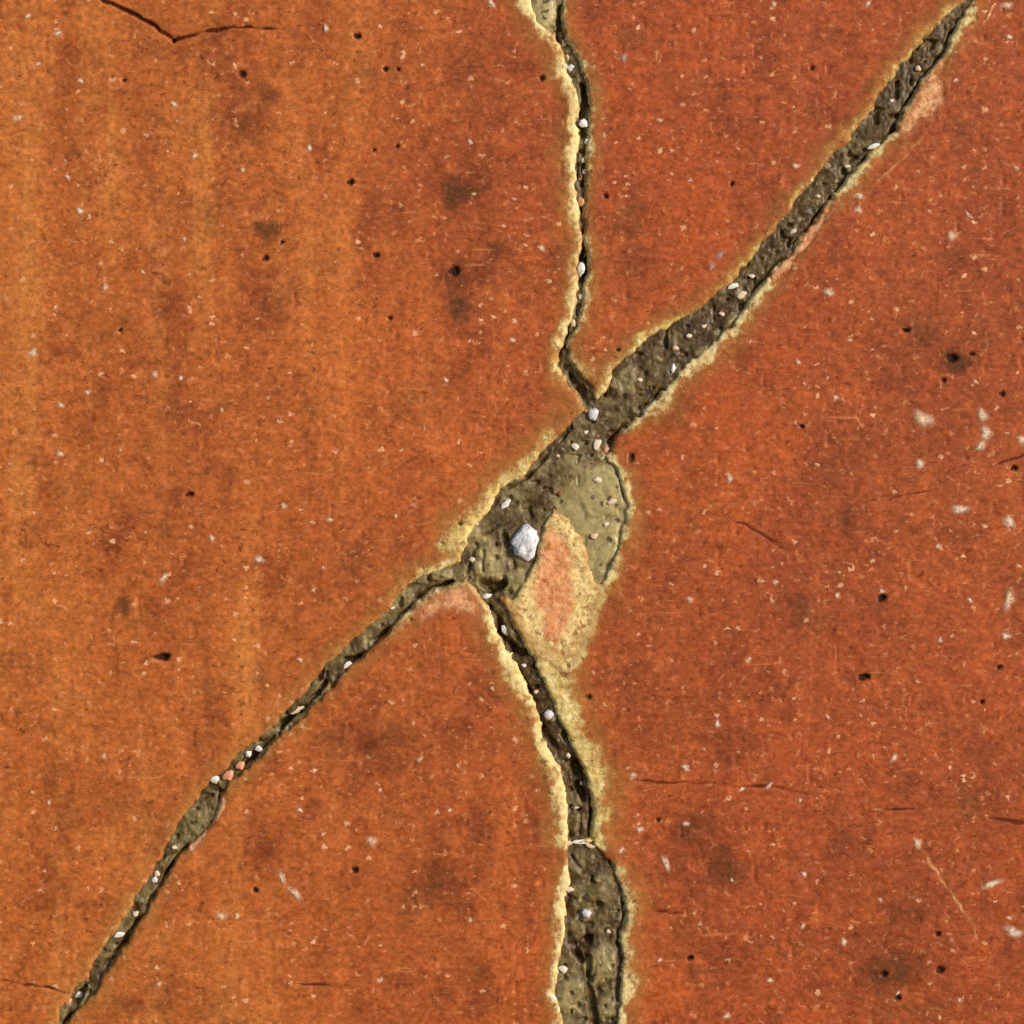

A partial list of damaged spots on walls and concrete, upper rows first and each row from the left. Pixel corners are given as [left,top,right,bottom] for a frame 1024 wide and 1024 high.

crack [101,0,274,43]
crack [555,0,972,450]
peeling [513,457,628,662]
crack [735,521,774,544]
crack [59,412,611,1024]